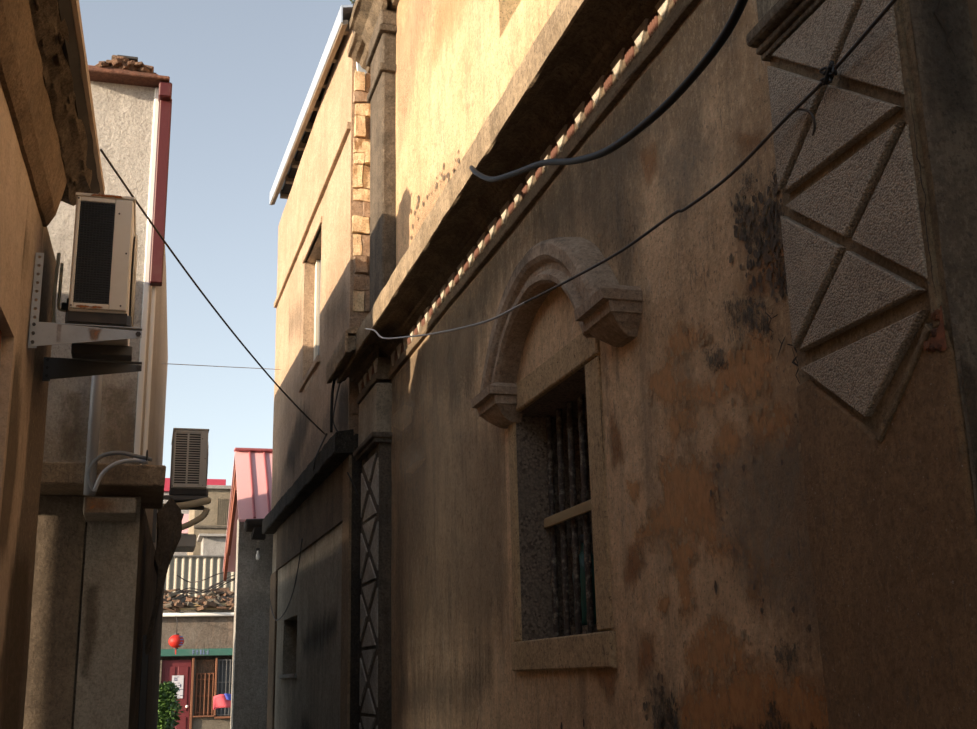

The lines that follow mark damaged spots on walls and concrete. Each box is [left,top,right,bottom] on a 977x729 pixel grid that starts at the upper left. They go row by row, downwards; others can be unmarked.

leakage [724,168,788,350]